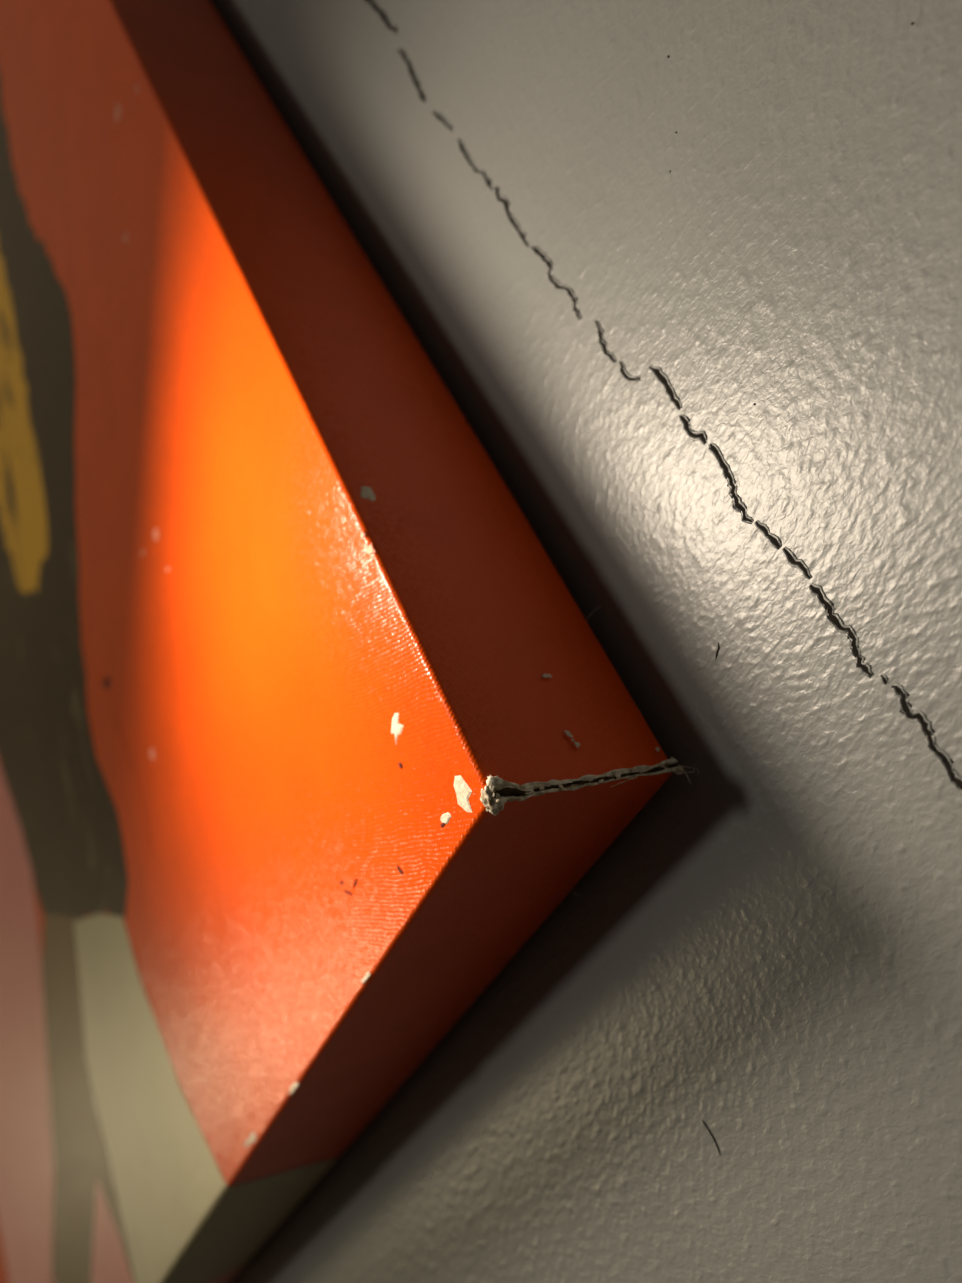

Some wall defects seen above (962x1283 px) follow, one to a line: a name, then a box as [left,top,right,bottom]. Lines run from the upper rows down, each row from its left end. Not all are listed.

crack [363,0,962,792]